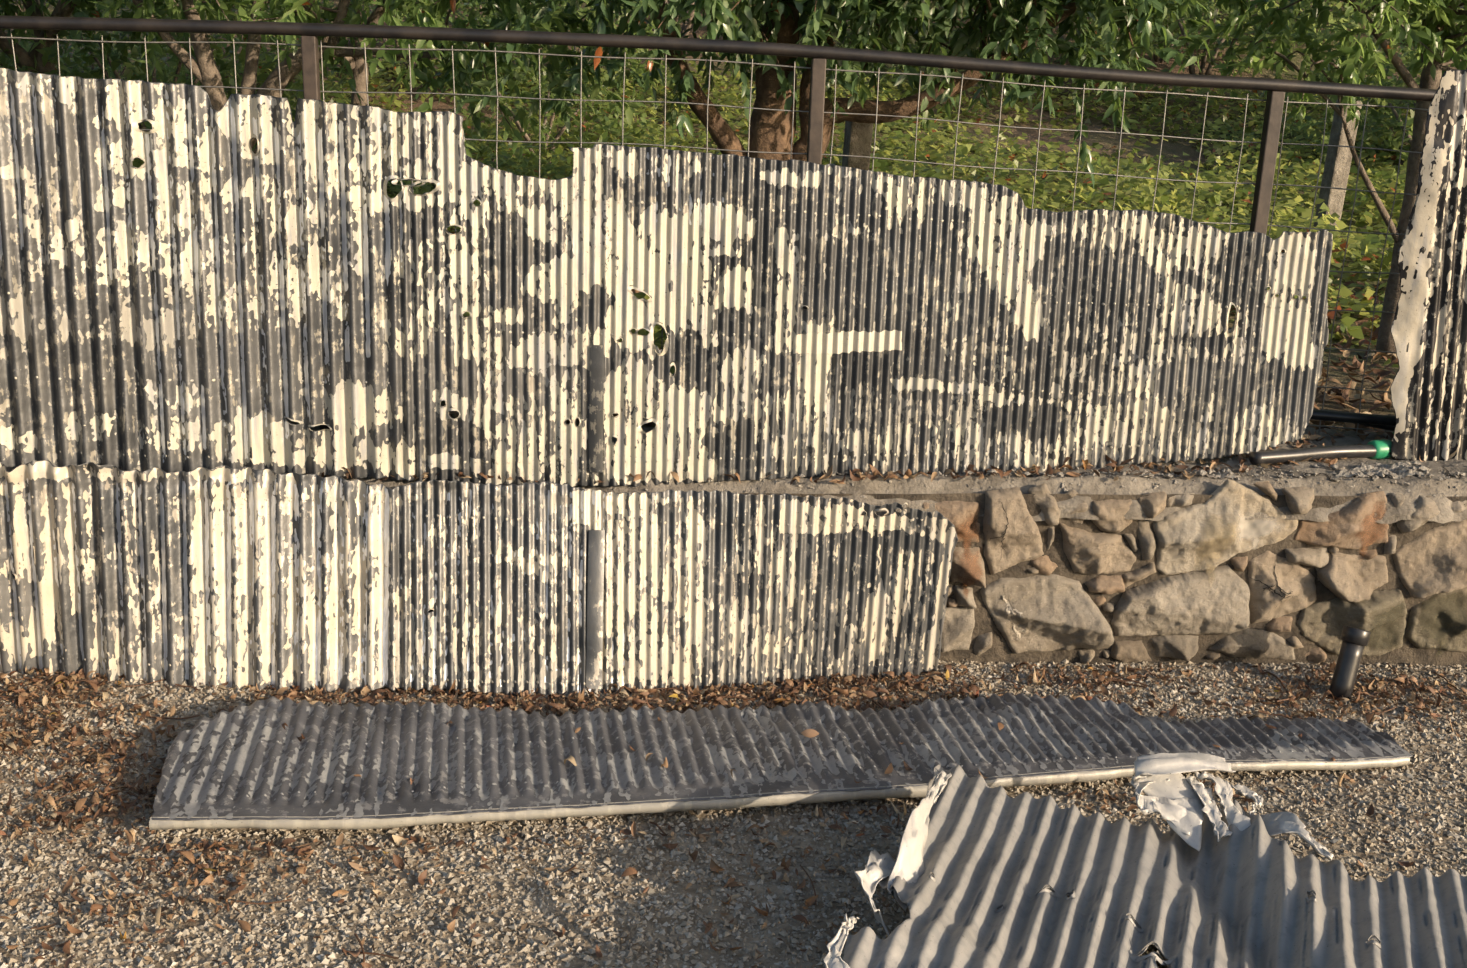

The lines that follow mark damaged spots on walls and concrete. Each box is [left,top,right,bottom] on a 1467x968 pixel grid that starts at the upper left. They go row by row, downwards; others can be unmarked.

peeling [0,71,1412,819]
peeling [1330,70,1467,479]